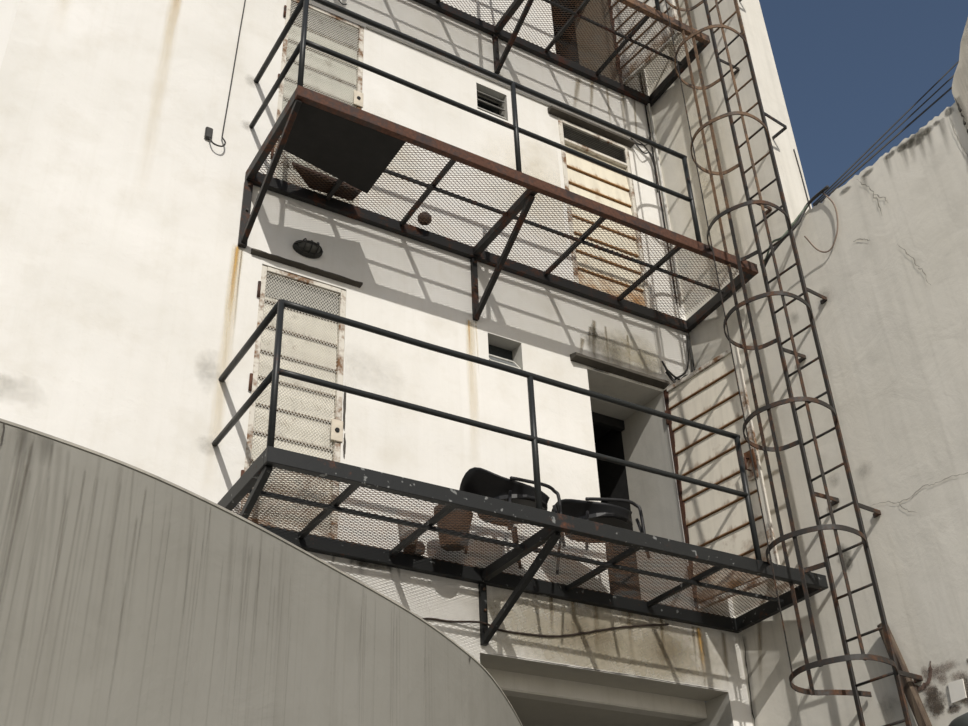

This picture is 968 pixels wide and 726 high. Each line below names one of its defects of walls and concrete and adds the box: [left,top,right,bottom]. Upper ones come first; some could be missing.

water stain [889,111,951,156]
rust [230,247,242,313]
crack [873,472,968,513]